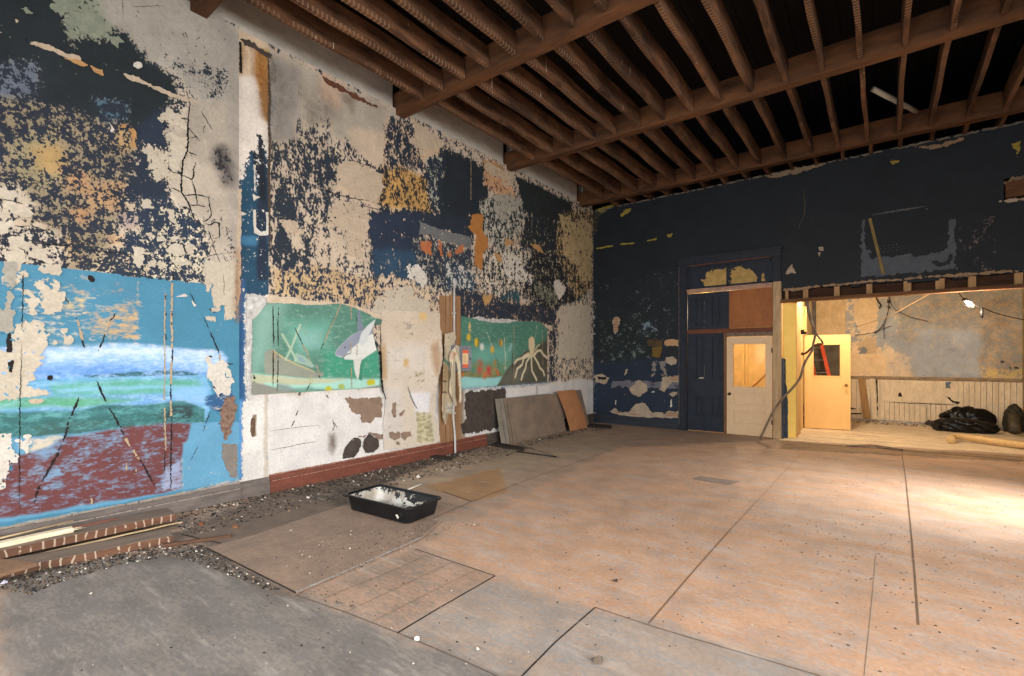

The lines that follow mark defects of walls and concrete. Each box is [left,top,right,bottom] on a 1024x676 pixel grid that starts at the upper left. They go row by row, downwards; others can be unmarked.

peeling [26,38,104,76]
peeling [50,0,124,48]
peeling [109,62,196,182]
peeling [410,119,442,155]
peeling [125,199,154,211]
peeling [0,186,91,404]
crack [18,101,227,504]
peeling [203,156,533,478]
flaking render [594,374,609,384]
flaking render [610,339,679,419]
peeling [0,433,33,490]
spalling [34,397,79,504]